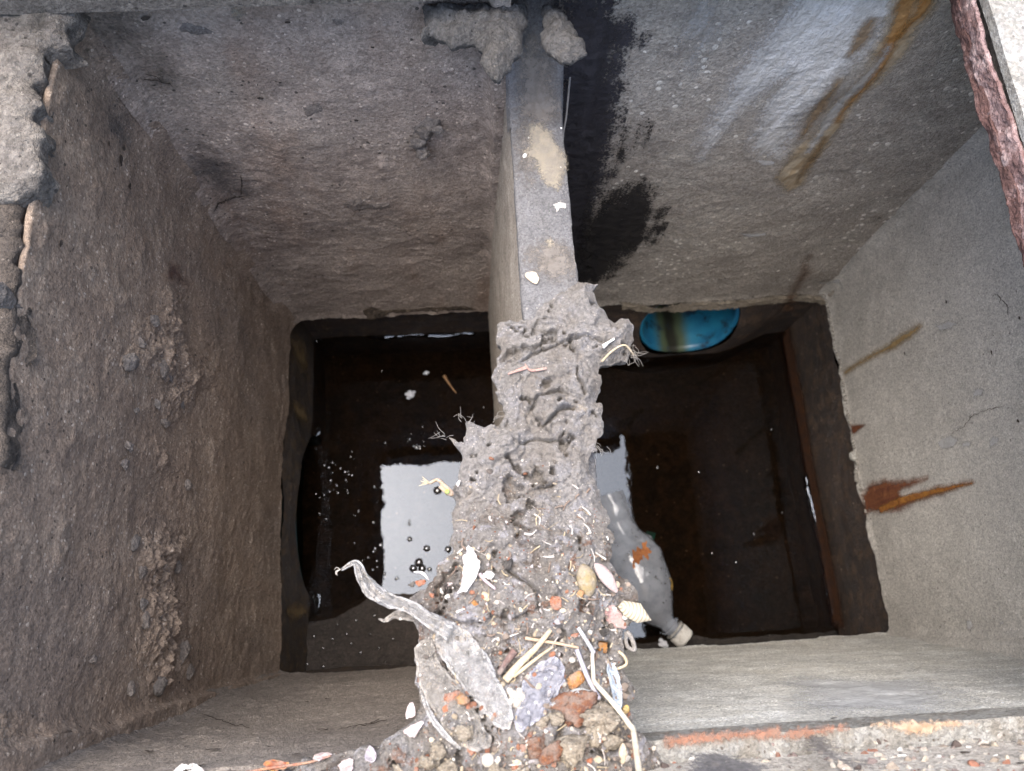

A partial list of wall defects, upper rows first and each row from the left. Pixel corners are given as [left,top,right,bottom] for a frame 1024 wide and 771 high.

rust [776,0,937,192]
leakage [616,118,654,165]
rust [845,326,920,374]
rust [862,479,972,512]